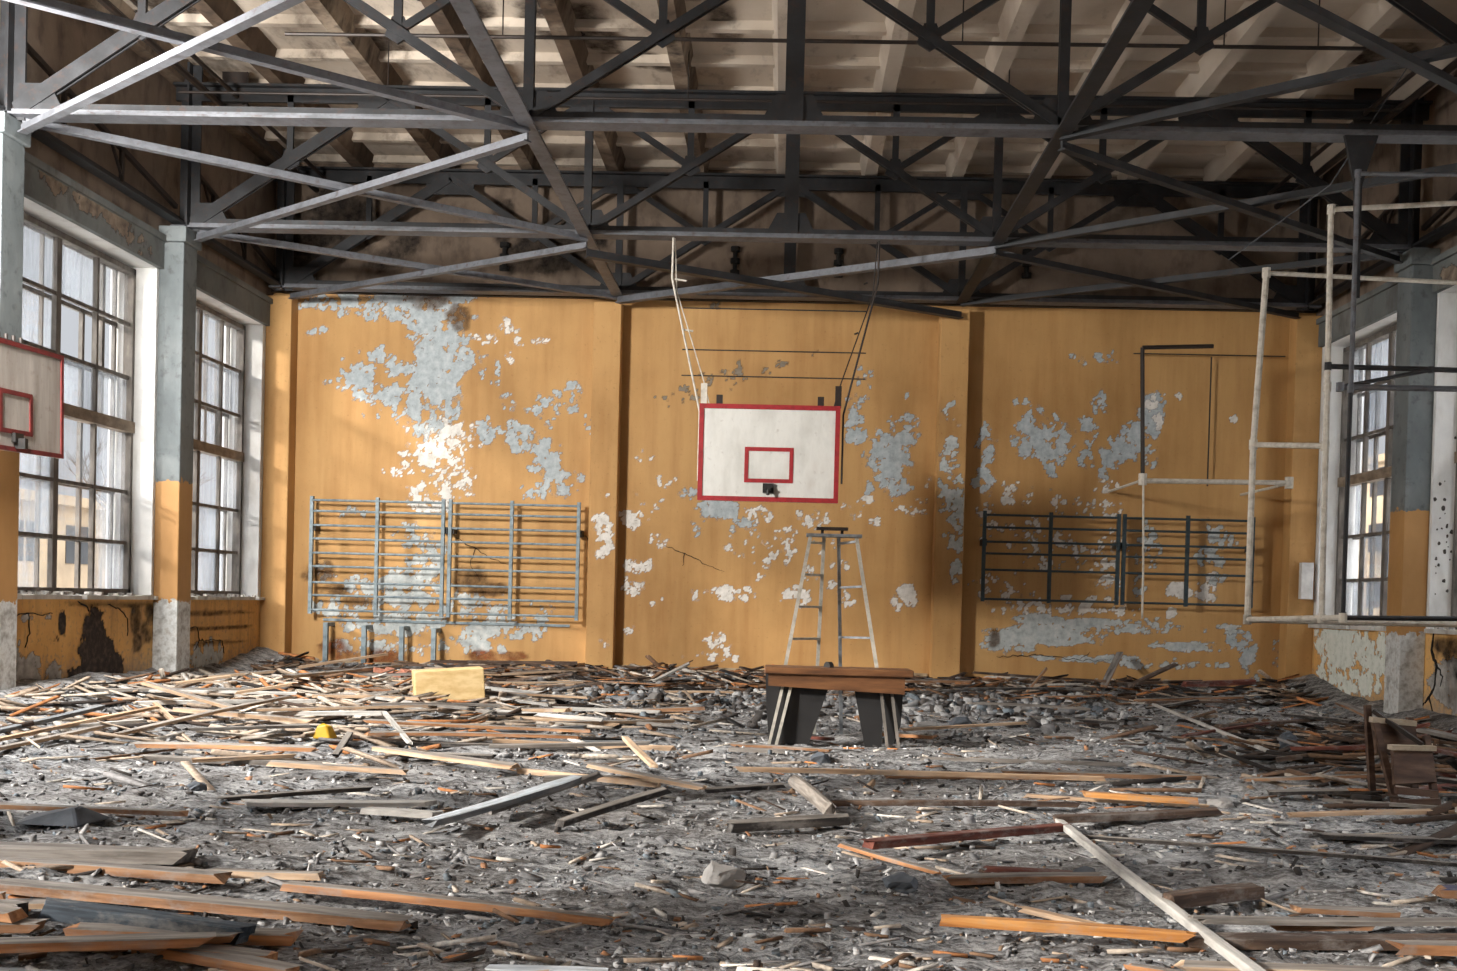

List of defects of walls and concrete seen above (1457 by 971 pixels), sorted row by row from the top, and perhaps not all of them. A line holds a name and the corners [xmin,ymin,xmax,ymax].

peeling [1069,350,1114,366]
peeling [298,294,591,656]
peeling [591,360,1279,686]
spalling [16,605,124,681]
leakage [1433,639,1457,679]